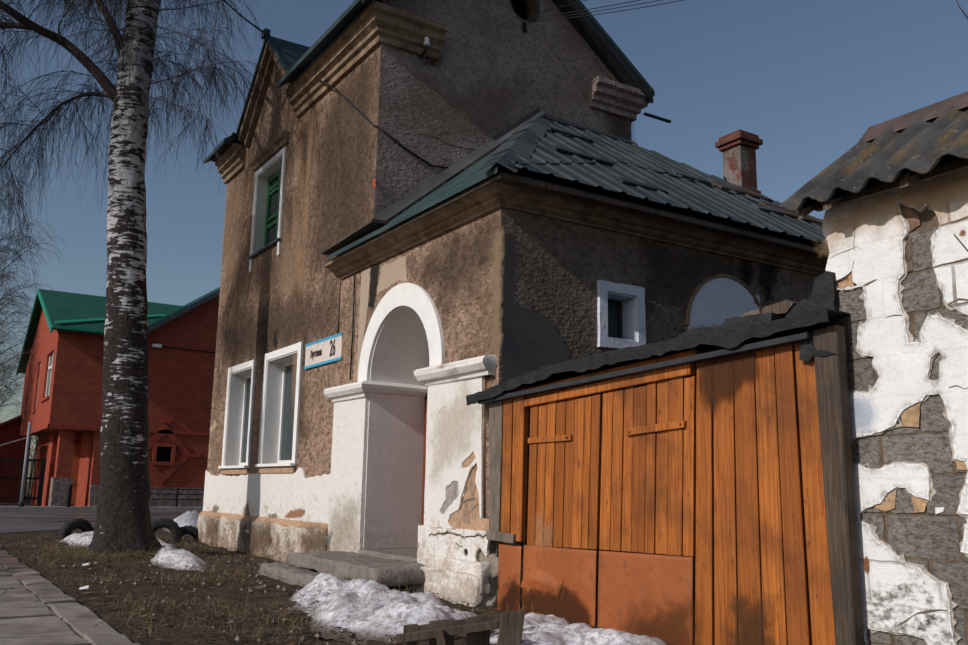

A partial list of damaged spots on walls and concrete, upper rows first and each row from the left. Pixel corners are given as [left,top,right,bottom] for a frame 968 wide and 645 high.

crack [417,131,476,151]
crack [940,216,968,227]
spalling [899,202,968,343]
crack [933,257,968,268]
spalling [440,452,489,531]
crack [459,463,476,509]
spalling [851,351,968,645]
crack [429,529,487,562]